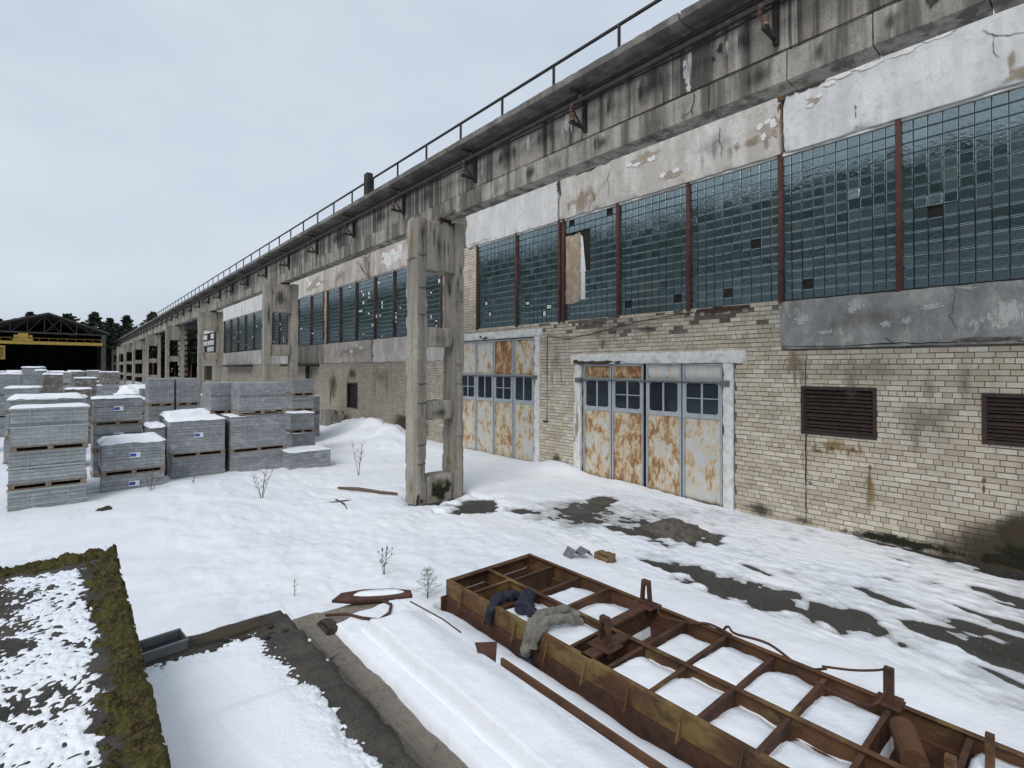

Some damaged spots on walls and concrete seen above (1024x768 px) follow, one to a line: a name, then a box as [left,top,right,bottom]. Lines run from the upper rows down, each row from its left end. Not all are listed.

crack [982,30,1024,58]
crack [443,0,898,202]
spalling [683,60,691,92]
peeling [757,29,956,141]
peeling [626,150,661,168]
peeling [659,167,683,180]